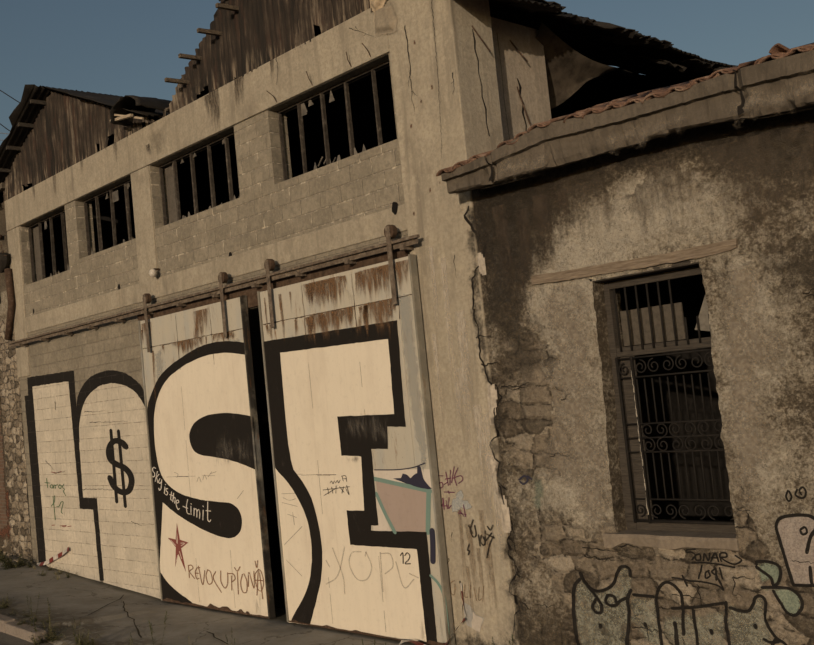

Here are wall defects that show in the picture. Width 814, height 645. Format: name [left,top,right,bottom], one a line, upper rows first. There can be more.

crack [404,26,418,105]
crack [472,25,530,140]
crack [732,69,745,115]
spalling [471,211,486,276]
corrosion [294,260,408,337]
damp [477,187,567,369]
corrosion [152,309,234,376]
spalling [487,383,498,425]
crack [453,206,568,643]
spalling [485,452,498,479]
spalling [497,495,511,533]